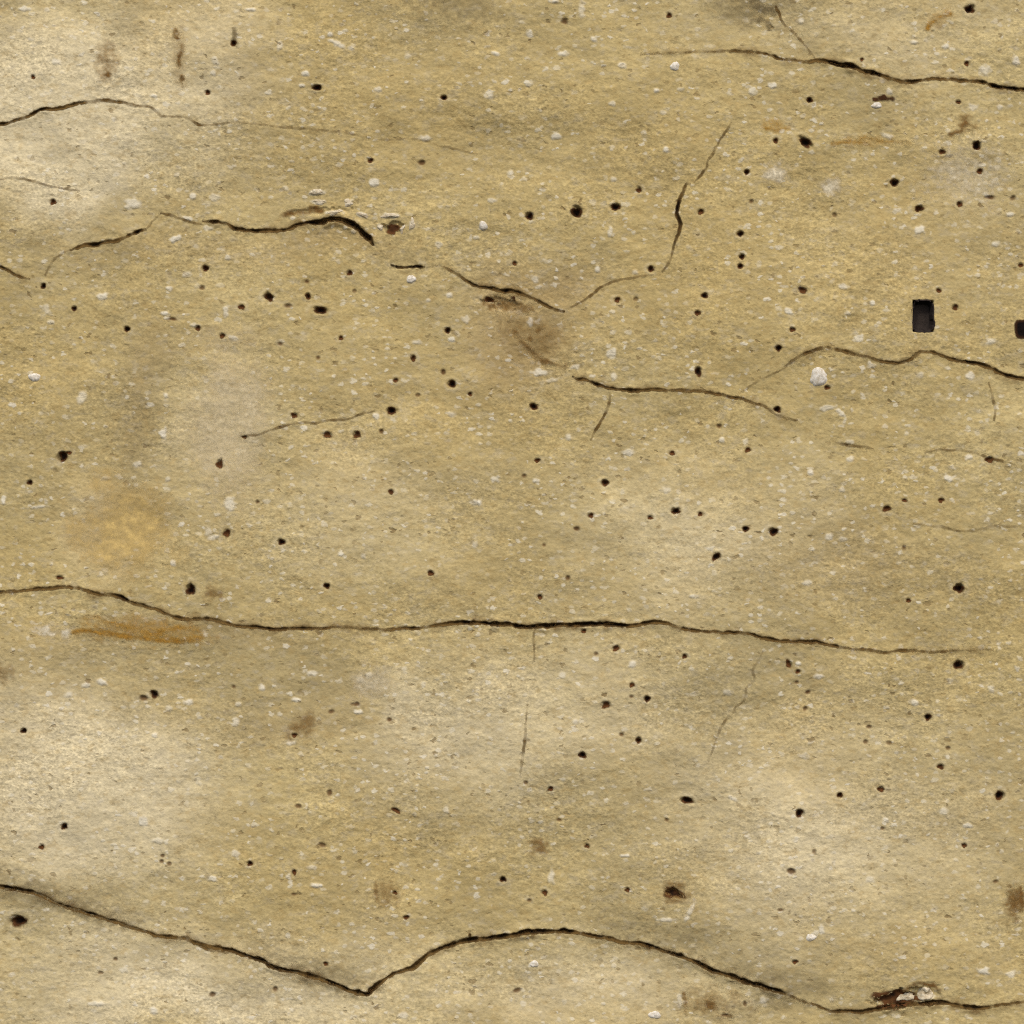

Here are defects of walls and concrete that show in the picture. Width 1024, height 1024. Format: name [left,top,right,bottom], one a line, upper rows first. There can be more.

crack [714,6,1024,92]
crack [0,98,164,126]
crack [663,131,727,270]
crack [0,265,25,278]
crack [70,213,619,313]
crack [790,346,1024,381]
crack [572,375,768,432]
corrosion [72,622,201,643]
crack [0,585,947,654]
crack [0,885,1022,1014]